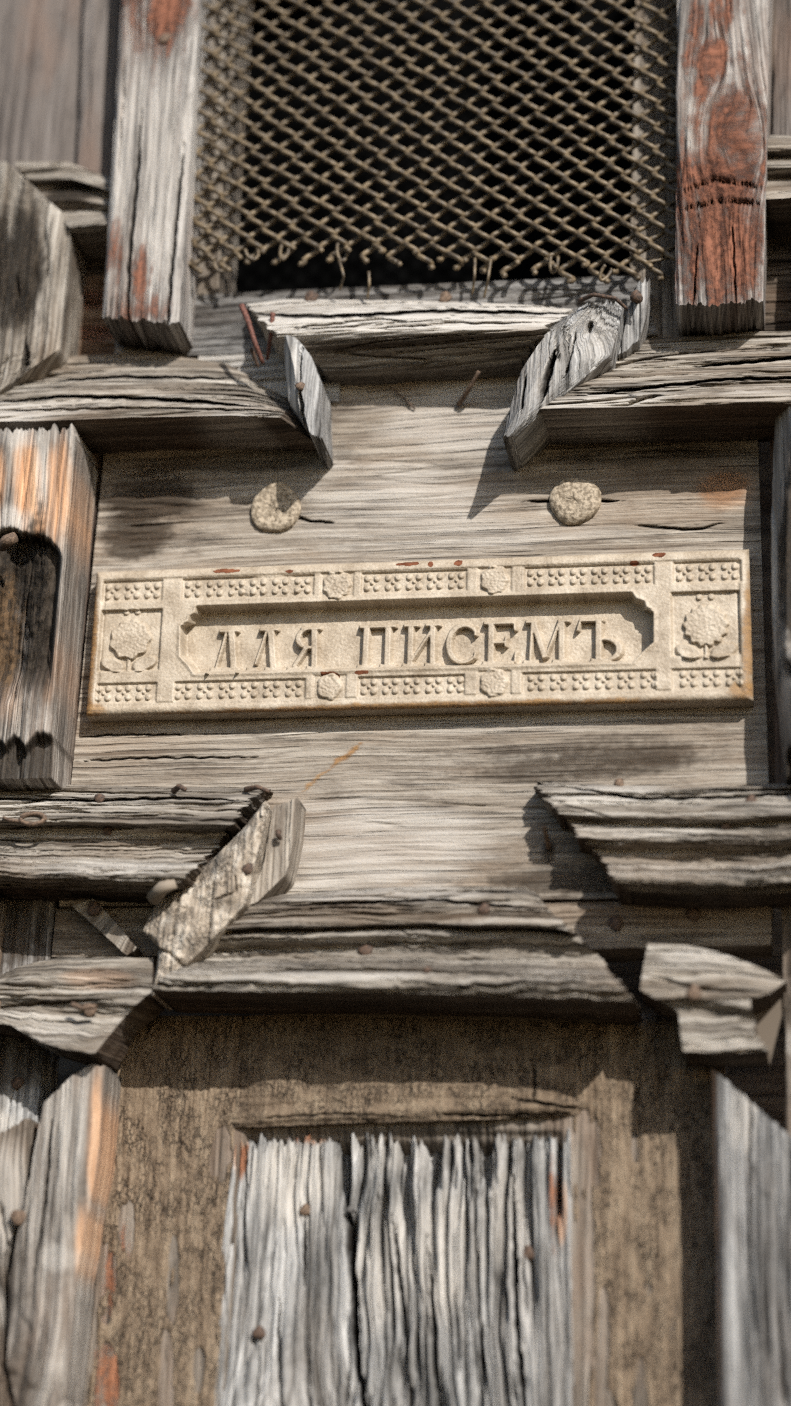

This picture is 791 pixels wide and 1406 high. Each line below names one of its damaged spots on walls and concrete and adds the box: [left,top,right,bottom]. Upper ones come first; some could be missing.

leakage [0,208,48,327]
crack [127,109,143,306]
crack [168,143,185,320]
crack [267,1064,573,1119]
crack [34,1121,53,1273]
crack [277,1221,312,1406]
crack [347,1155,368,1406]
crack [391,1213,443,1406]
crack [474,1163,527,1406]